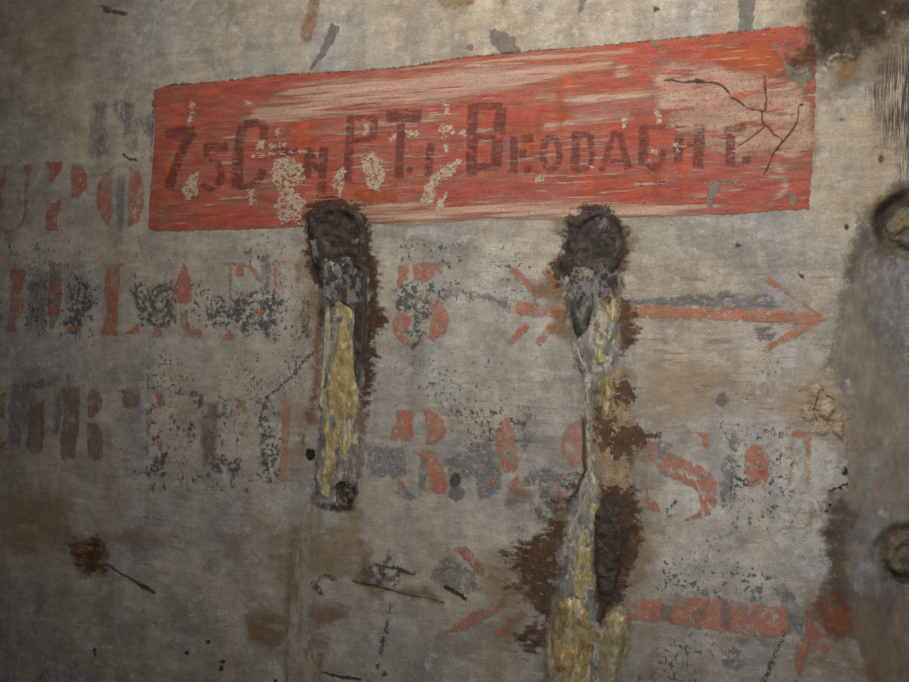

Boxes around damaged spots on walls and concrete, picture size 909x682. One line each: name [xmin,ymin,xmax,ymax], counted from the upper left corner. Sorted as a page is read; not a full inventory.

leakage [787,0,909,76]
crack [664,75,803,174]
leakage [811,57,909,682]
corrosion [69,536,155,593]
leakage [592,485,649,627]